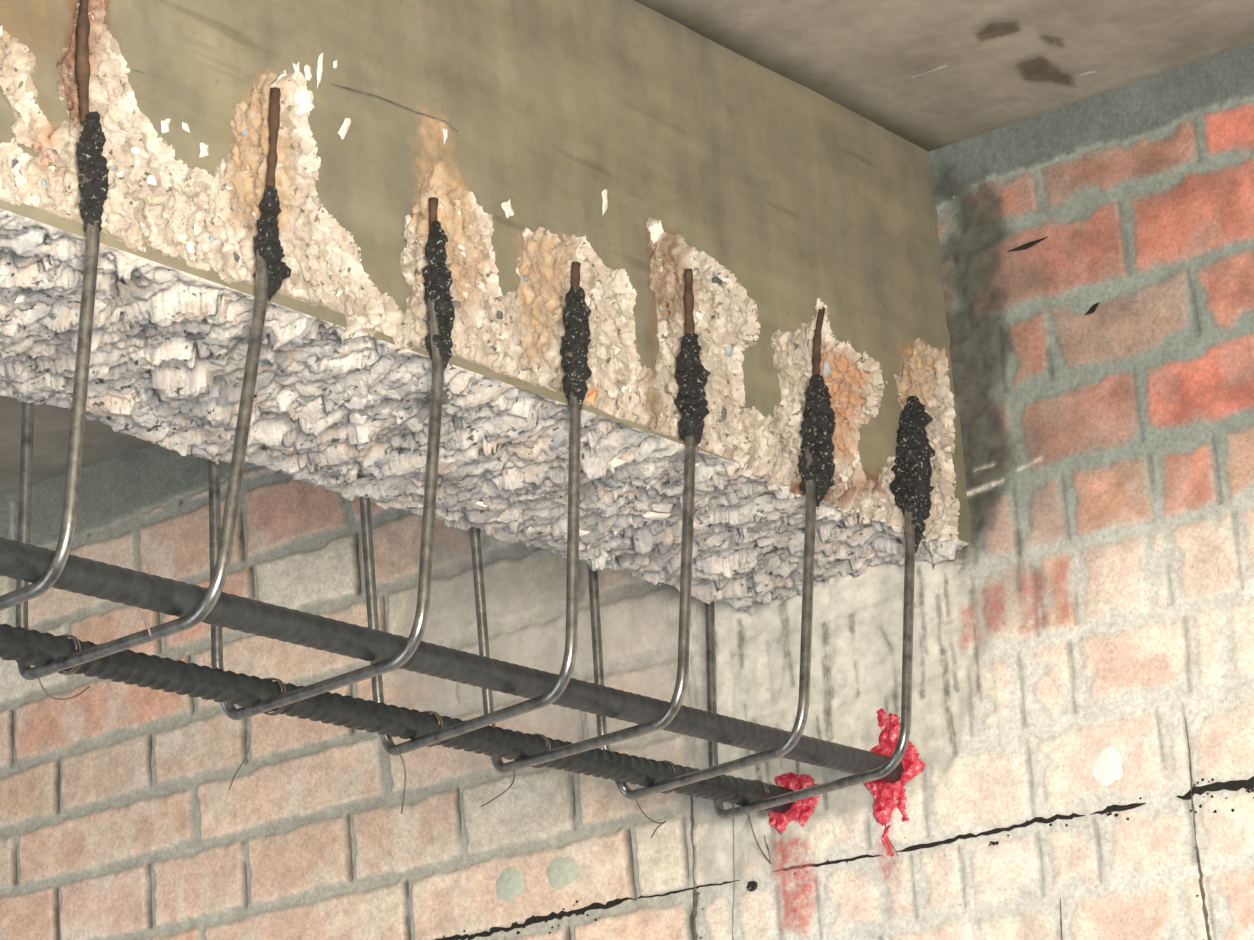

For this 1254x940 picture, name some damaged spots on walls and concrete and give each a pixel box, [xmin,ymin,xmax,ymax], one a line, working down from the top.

corrosion [59,0,107,117]
corrosion [411,116,477,308]
corrosion [519,239,570,352]
spalling [0,0,972,864]
corrosion [820,356,865,452]
water stain [938,173,1024,557]
corrosion [823,476,879,506]
crack [435,795,740,940]
crack [764,797,1146,875]
crack [1057,898,1065,940]
crack [1177,717,1254,940]